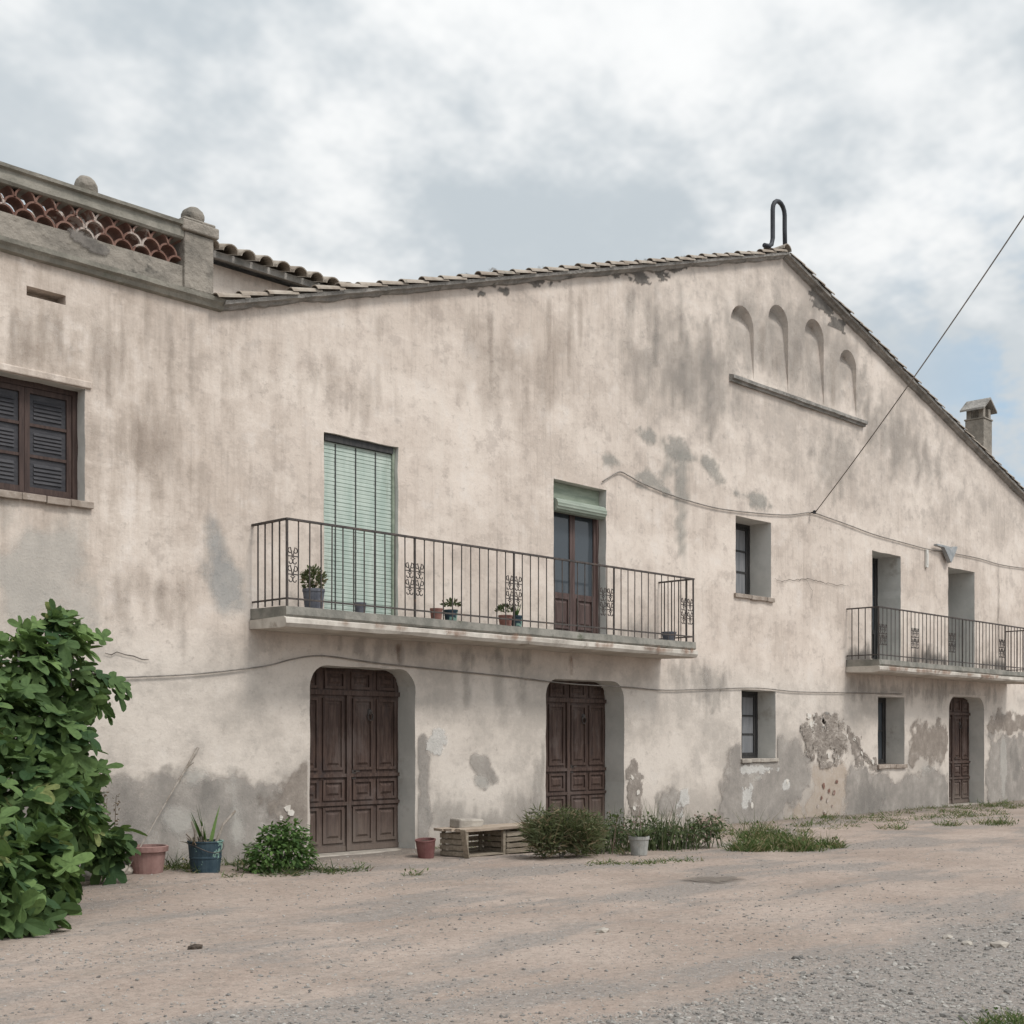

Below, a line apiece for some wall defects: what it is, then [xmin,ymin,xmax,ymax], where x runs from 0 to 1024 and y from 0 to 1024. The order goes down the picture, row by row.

flaking render [800,712,880,772]
flaking render [908,718,948,768]
flaking render [987,709,1024,735]
peeling [470,753,498,787]
flaking render [626,758,644,817]